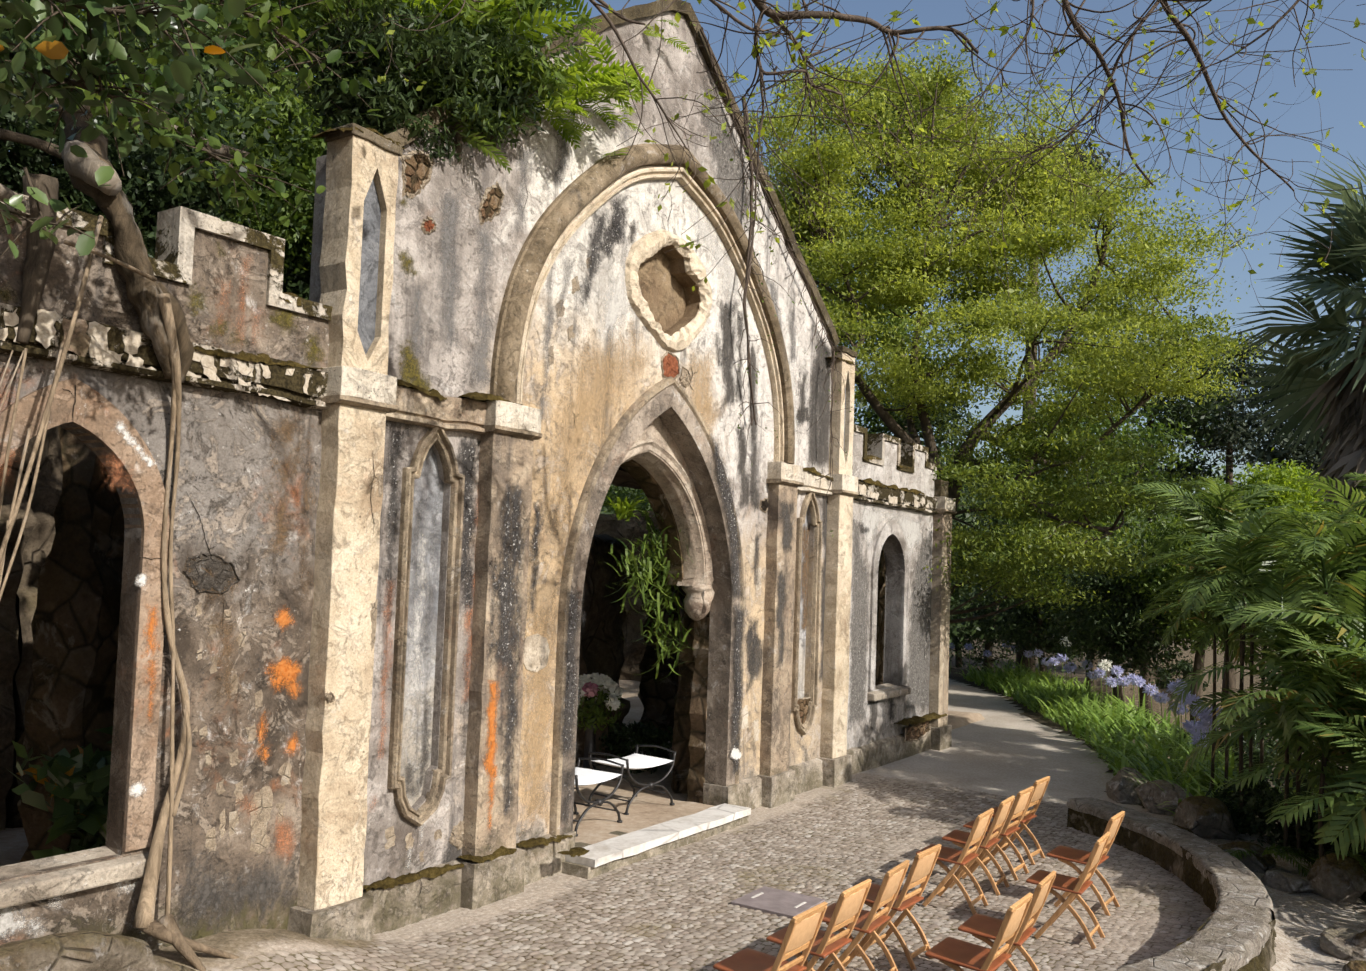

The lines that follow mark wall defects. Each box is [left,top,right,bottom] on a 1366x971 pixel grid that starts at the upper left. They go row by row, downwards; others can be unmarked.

spalling [399,150,435,199]
spalling [478,182,505,226]
peeling [0,309,156,376]
peeling [186,353,311,401]
damp [546,195,644,482]
spalling [661,350,692,388]
damp [691,207,832,774]
damp [457,438,481,703]
corrosion [275,610,292,626]
corrosion [270,659,301,696]
damp [489,485,584,822]
corrosion [484,682,499,828]